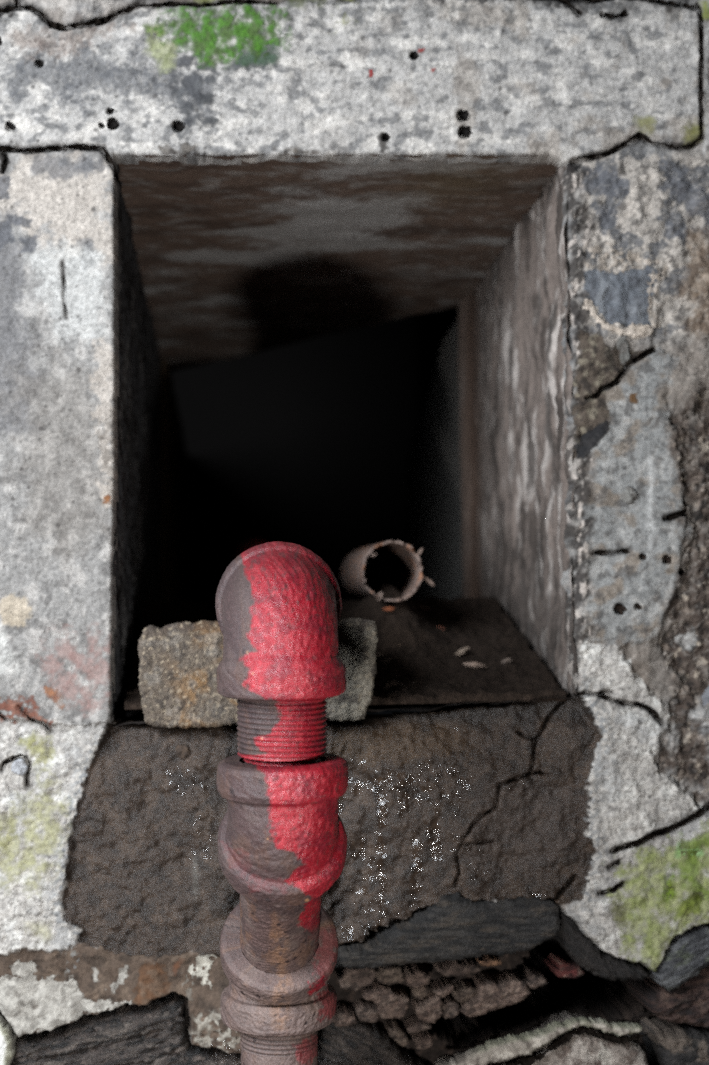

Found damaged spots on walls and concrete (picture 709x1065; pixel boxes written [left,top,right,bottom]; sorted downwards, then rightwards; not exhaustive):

crack [0,0,278,30]
crack [557,0,703,161]
crack [0,143,122,189]
crack [588,348,654,398]
crack [666,510,687,520]
crack [594,548,629,556]
rust [0,696,52,725]
crack [454,691,664,886]
crack [600,805,709,895]
crack [553,876,575,900]